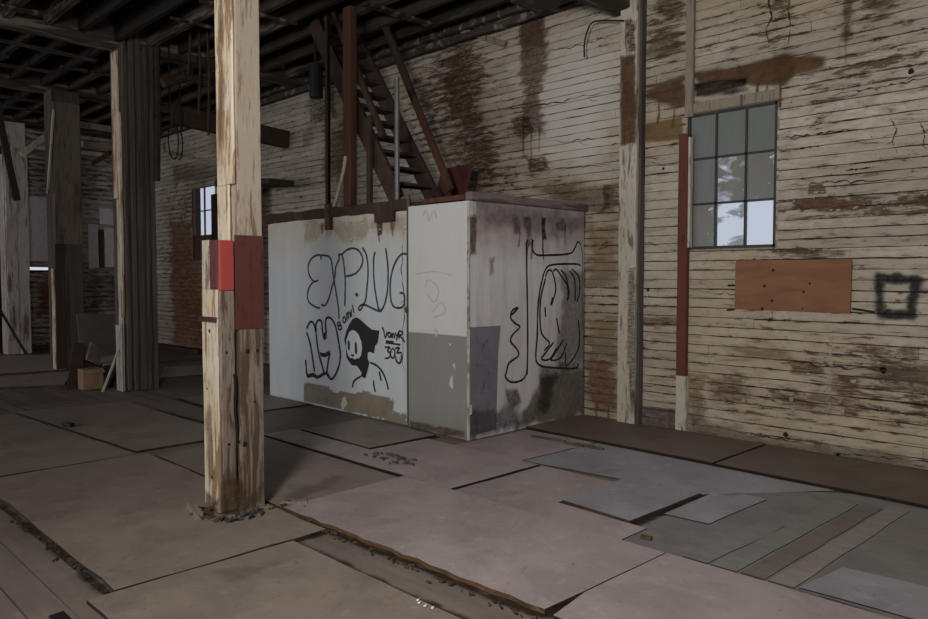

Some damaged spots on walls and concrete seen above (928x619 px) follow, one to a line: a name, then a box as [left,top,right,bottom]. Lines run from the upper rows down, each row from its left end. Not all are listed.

crack [759,0,794,53]
leakage [511,10,548,153]
flaking render [303,383,407,425]